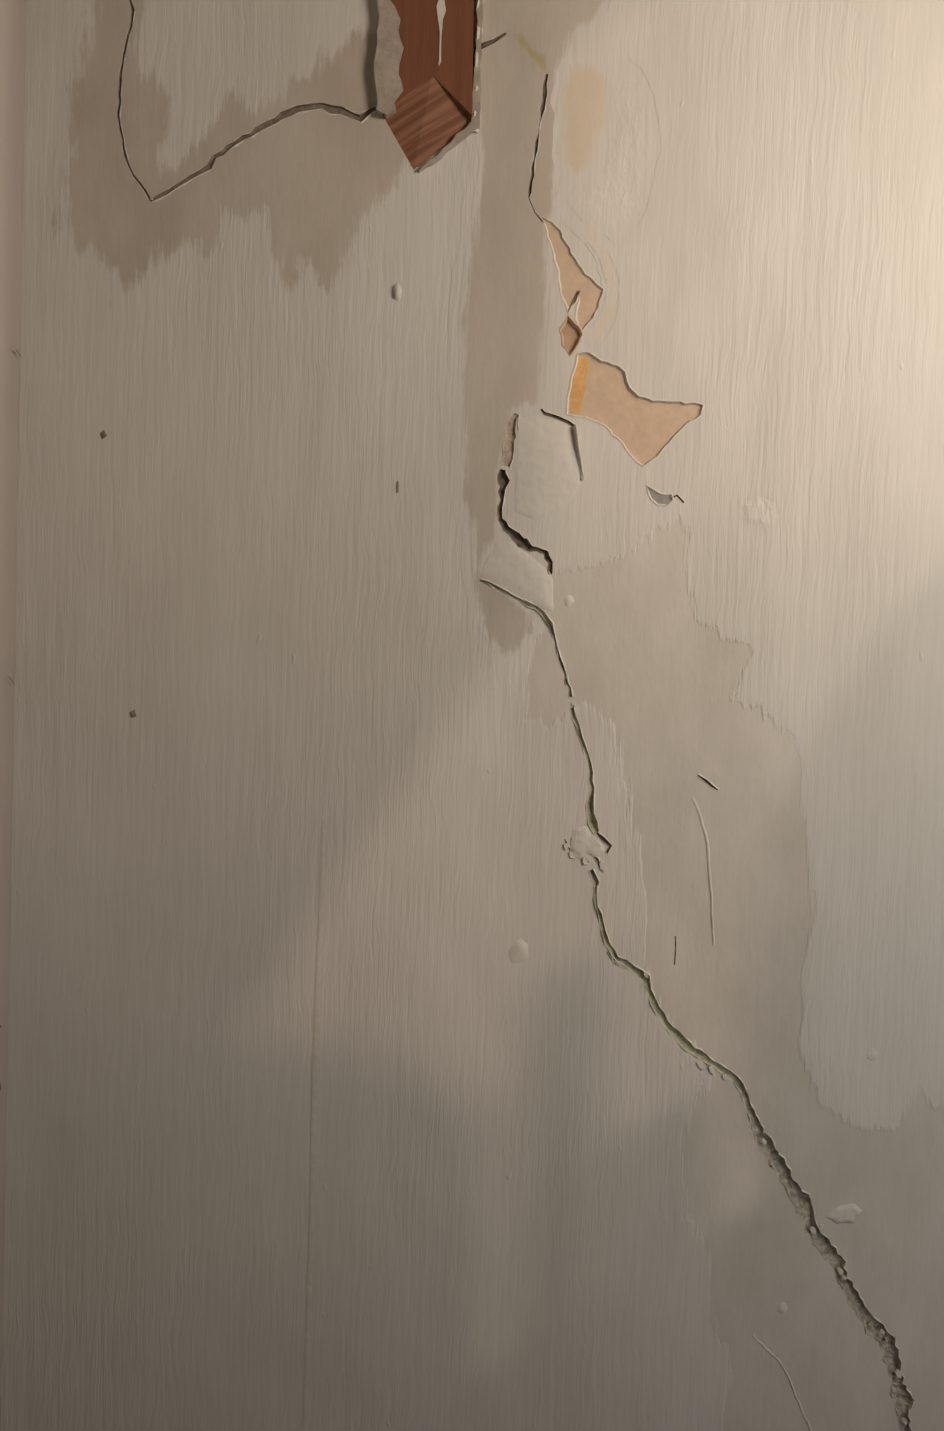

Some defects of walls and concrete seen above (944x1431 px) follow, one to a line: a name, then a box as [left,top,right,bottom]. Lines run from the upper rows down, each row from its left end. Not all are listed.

damp [46,0,418,319]
crack [116,0,377,203]
spalling [542,216,704,468]
peeling [646,485,685,507]
crack [479,408,915,1431]